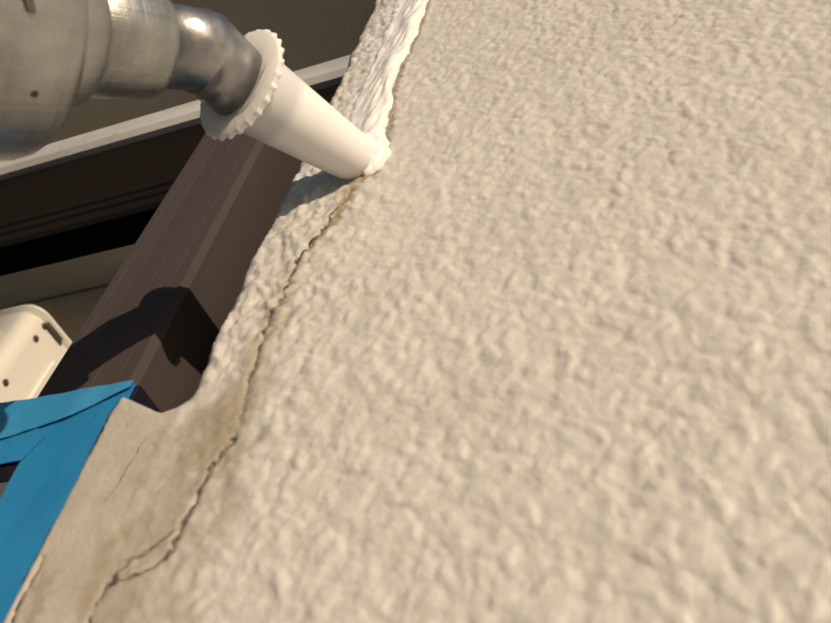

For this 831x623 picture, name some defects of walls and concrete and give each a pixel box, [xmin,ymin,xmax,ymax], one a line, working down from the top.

crack [89,185,352,623]